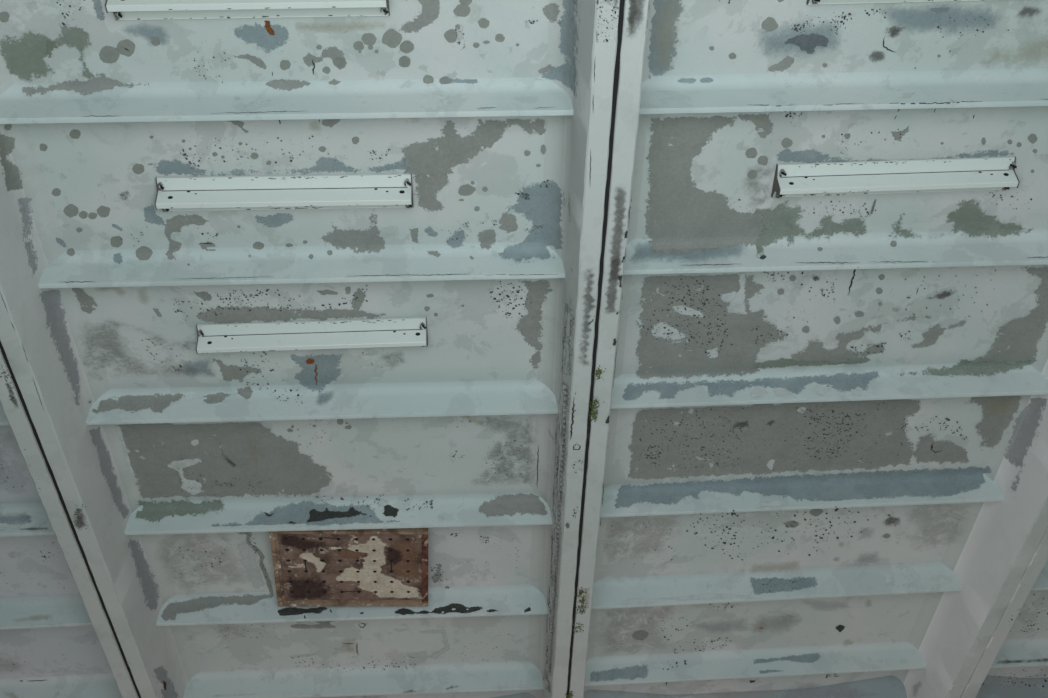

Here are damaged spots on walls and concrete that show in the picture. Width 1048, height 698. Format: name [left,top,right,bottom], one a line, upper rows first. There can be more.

peeling [388,118,546,212]
peeling [643,113,775,256]
peeling [409,228,441,257]
peeling [470,212,518,260]
peeling [635,274,786,379]
peeling [791,315,966,364]
peeling [966,266,1048,365]
peeling [88,393,334,499]
peeling [628,399,969,480]
peeling [964,396,1022,451]
spalling [307,505,399,523]